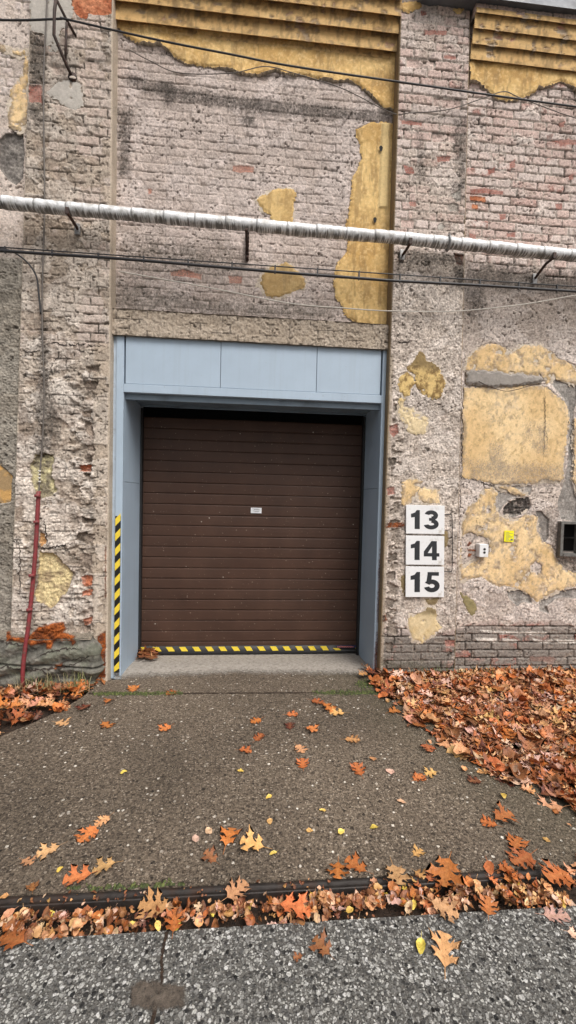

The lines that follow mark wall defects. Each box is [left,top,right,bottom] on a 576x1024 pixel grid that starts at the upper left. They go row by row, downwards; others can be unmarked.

peeling [0,44,42,185]
peeling [72,0,422,230]
peeling [469,59,576,103]
peeling [255,262,308,301]
peeling [333,241,389,324]
spalling [84,365,100,390]
peeling [390,350,447,437]
spalling [80,411,95,479]
peeling [443,342,576,616]
spalling [34,517,96,608]
spalling [385,553,407,607]
peeling [385,597,455,652]